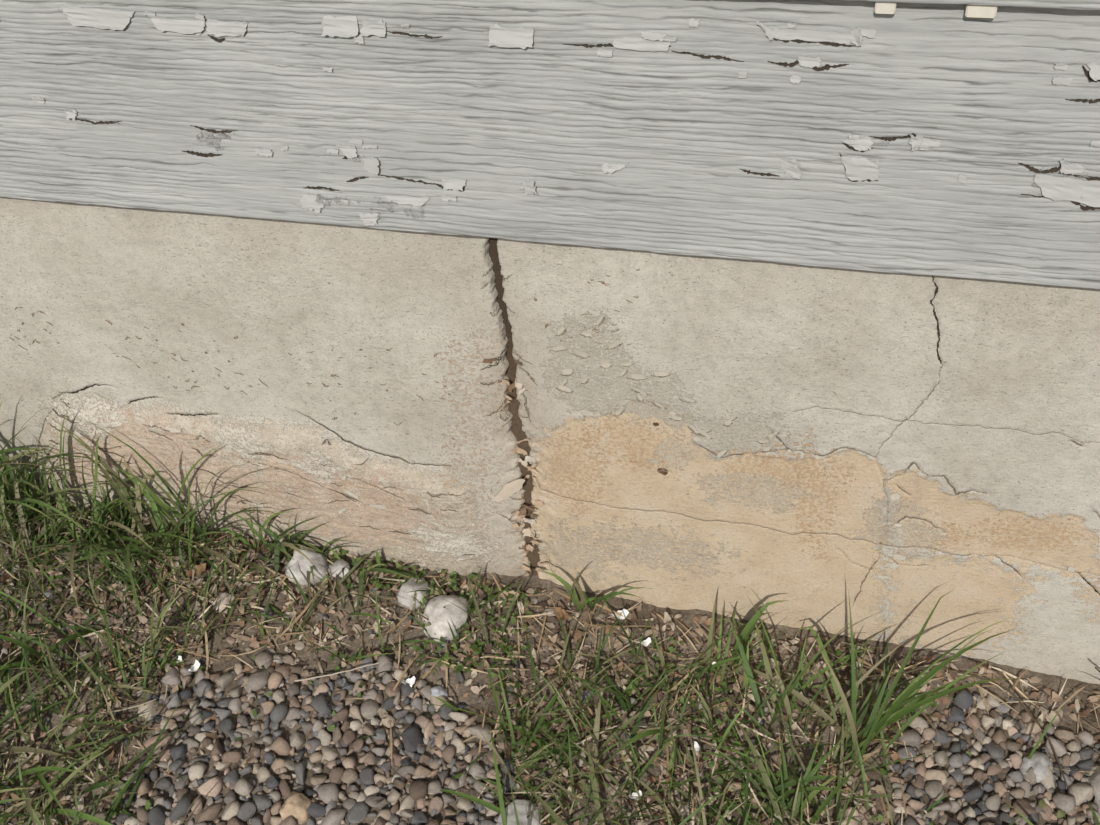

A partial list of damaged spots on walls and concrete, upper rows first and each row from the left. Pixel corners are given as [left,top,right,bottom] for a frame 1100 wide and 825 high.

peeling [60,5,248,43]
peeling [321,15,442,44]
peeling [565,29,748,78]
peeling [756,20,876,84]
peeling [183,125,238,158]
peeling [300,138,467,226]
peeling [840,133,940,182]
peeling [1018,160,1100,211]
crack [53,384,213,420]
crack [296,411,447,466]
crack [481,238,1100,602]
peeling [511,399,1100,660]